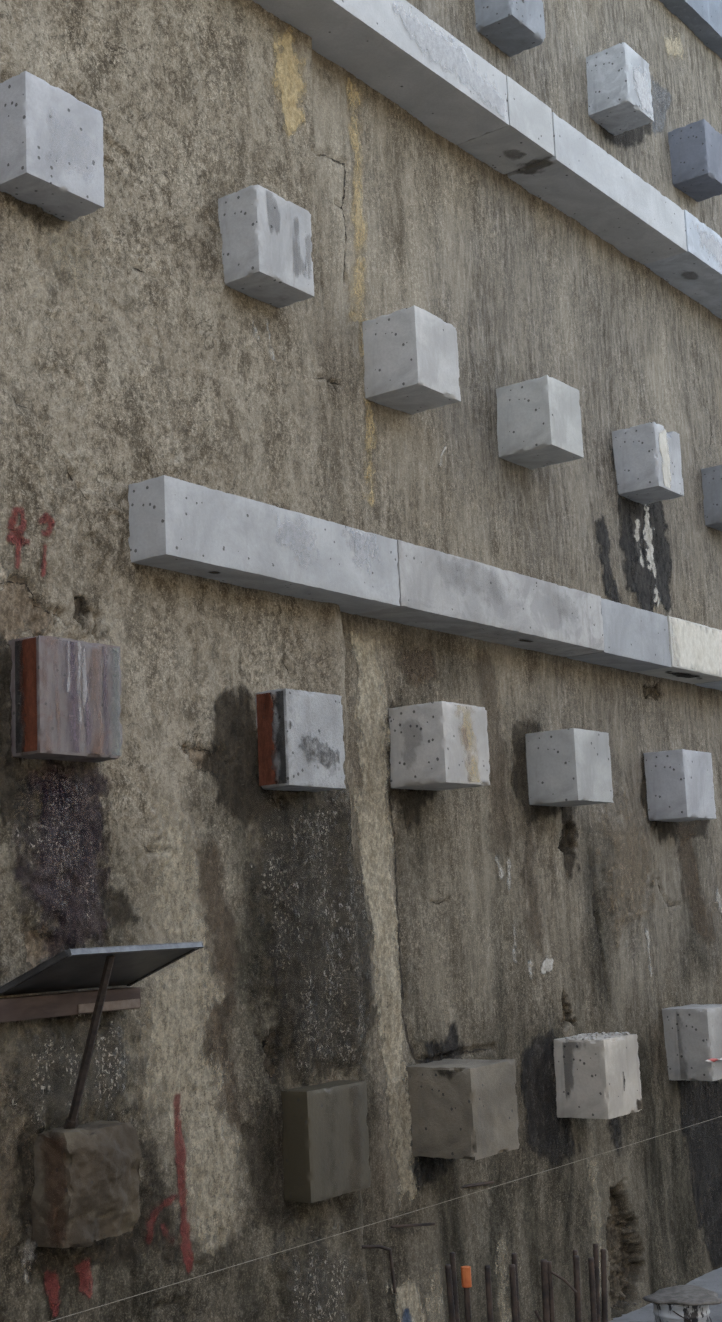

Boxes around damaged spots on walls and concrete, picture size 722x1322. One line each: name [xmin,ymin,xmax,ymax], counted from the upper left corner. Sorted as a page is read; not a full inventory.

corrosion [21,637,37,752]
leakage [0,631,138,957]
corrosion [256,692,277,786]
leakage [201,631,453,1199]
leakage [141,801,240,1252]
leakage [425,1022,464,1077]
leakage [18,1127,176,1281]
spalling [573,1190,635,1322]